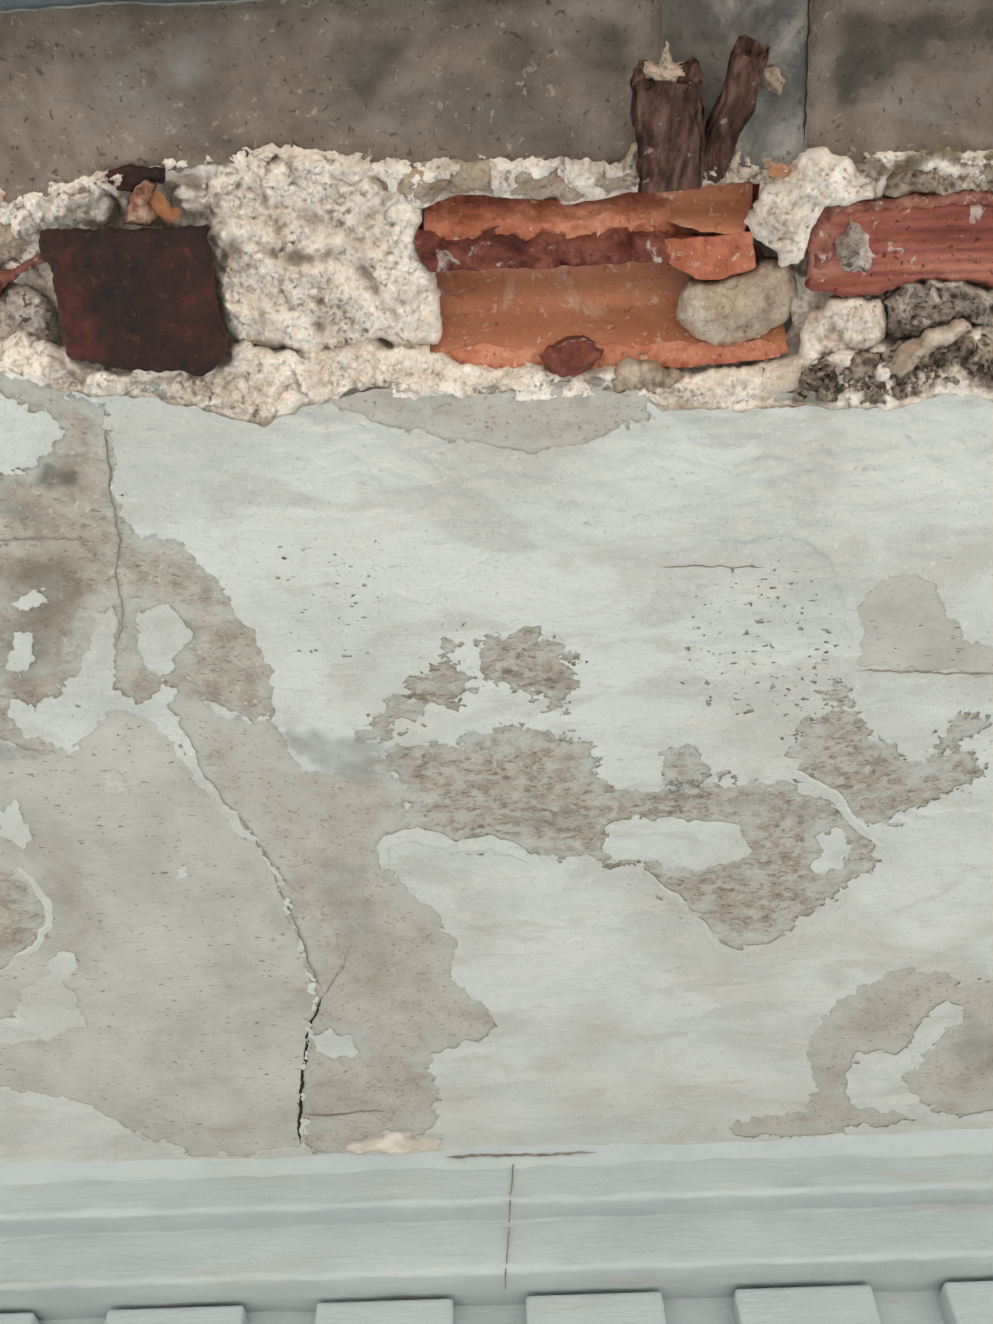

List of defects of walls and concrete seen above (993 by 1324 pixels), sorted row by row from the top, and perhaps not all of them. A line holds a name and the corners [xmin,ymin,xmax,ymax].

peeling [0,143,993,1158]
crack [241,819,384,1144]
crack [448,1151,595,1290]